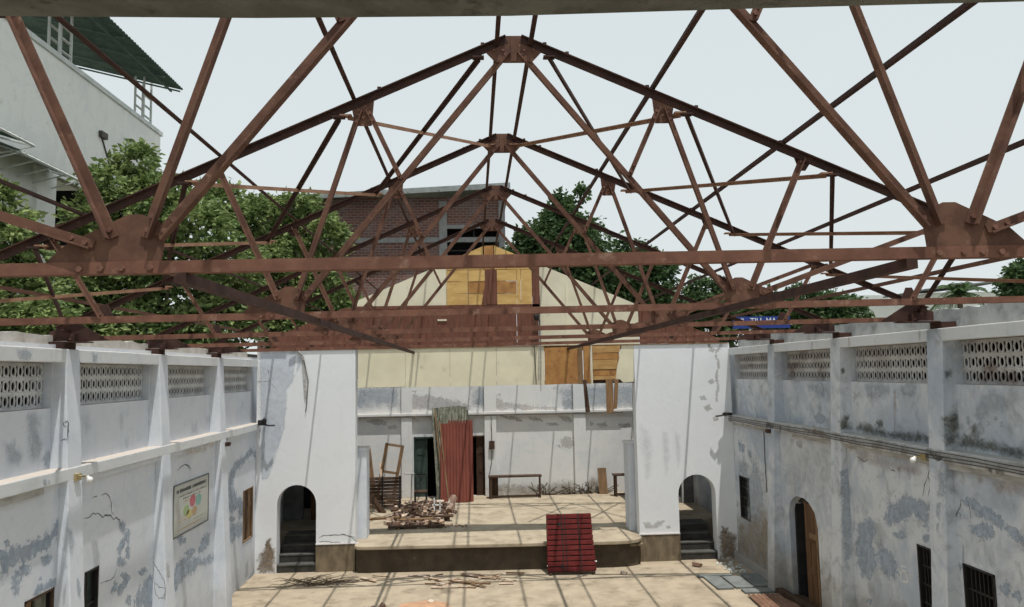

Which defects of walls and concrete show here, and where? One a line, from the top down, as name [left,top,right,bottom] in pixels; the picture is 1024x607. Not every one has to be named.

peeling [0,523,58,596]
crack [84,493,123,528]
peeling [110,520,153,607]
peeling [166,534,214,591]
peeling [228,447,256,542]
peeling [856,494,930,580]
peeling [962,496,1024,545]